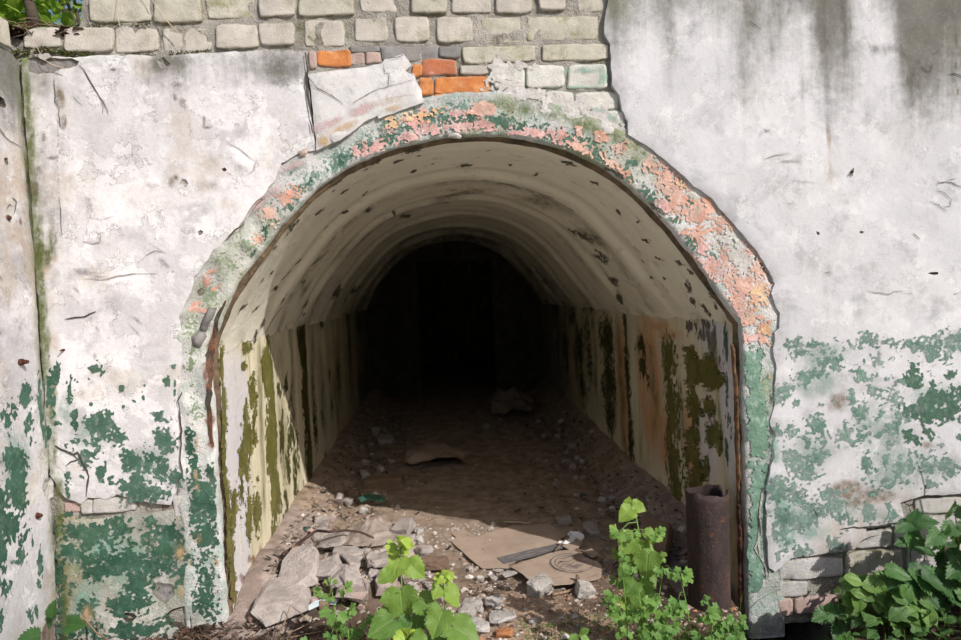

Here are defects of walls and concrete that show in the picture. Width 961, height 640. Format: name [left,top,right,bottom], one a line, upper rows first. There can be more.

crack [305,52,415,133]
peeling [0,268,341,640]
rust [204,338,216,389]
peeling [250,99,961,616]